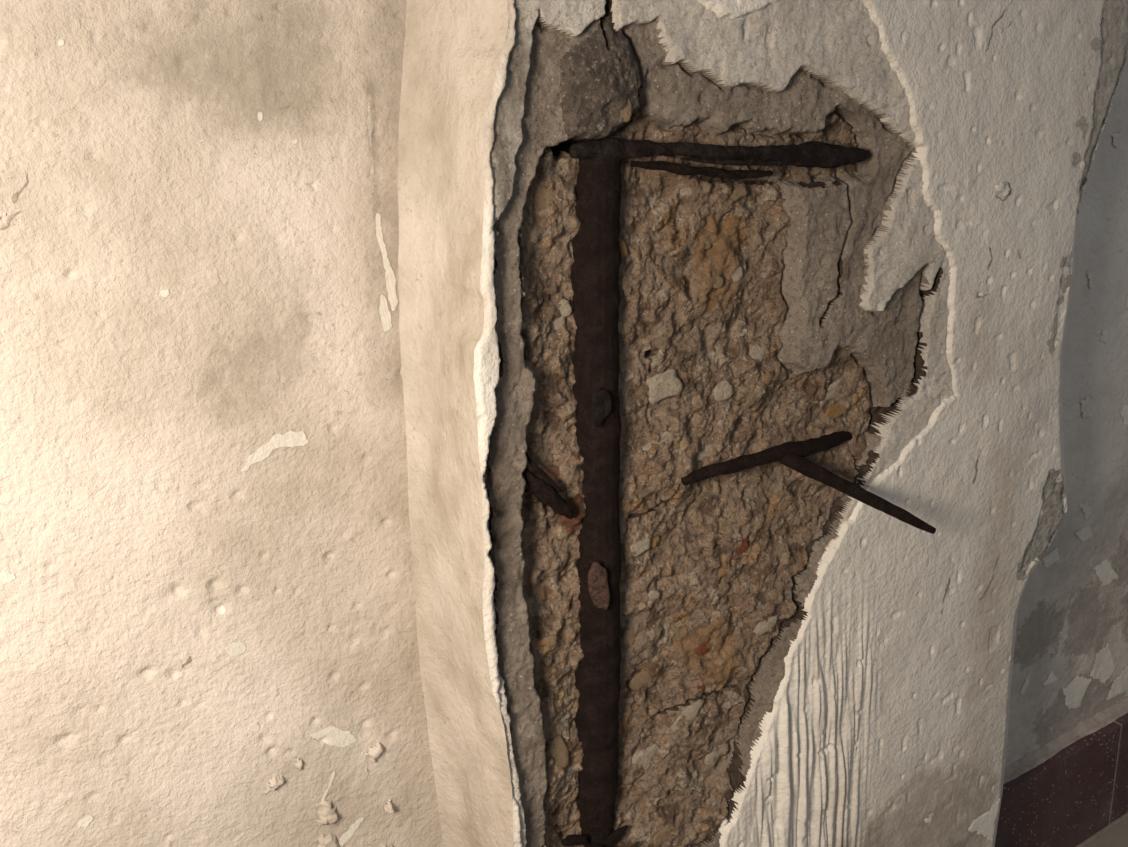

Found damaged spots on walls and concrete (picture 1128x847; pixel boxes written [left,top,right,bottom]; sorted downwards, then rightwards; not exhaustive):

rust [630,157,820,180]
spalling [487,0,954,847]
rust [588,561,610,610]
rust [560,825,653,847]